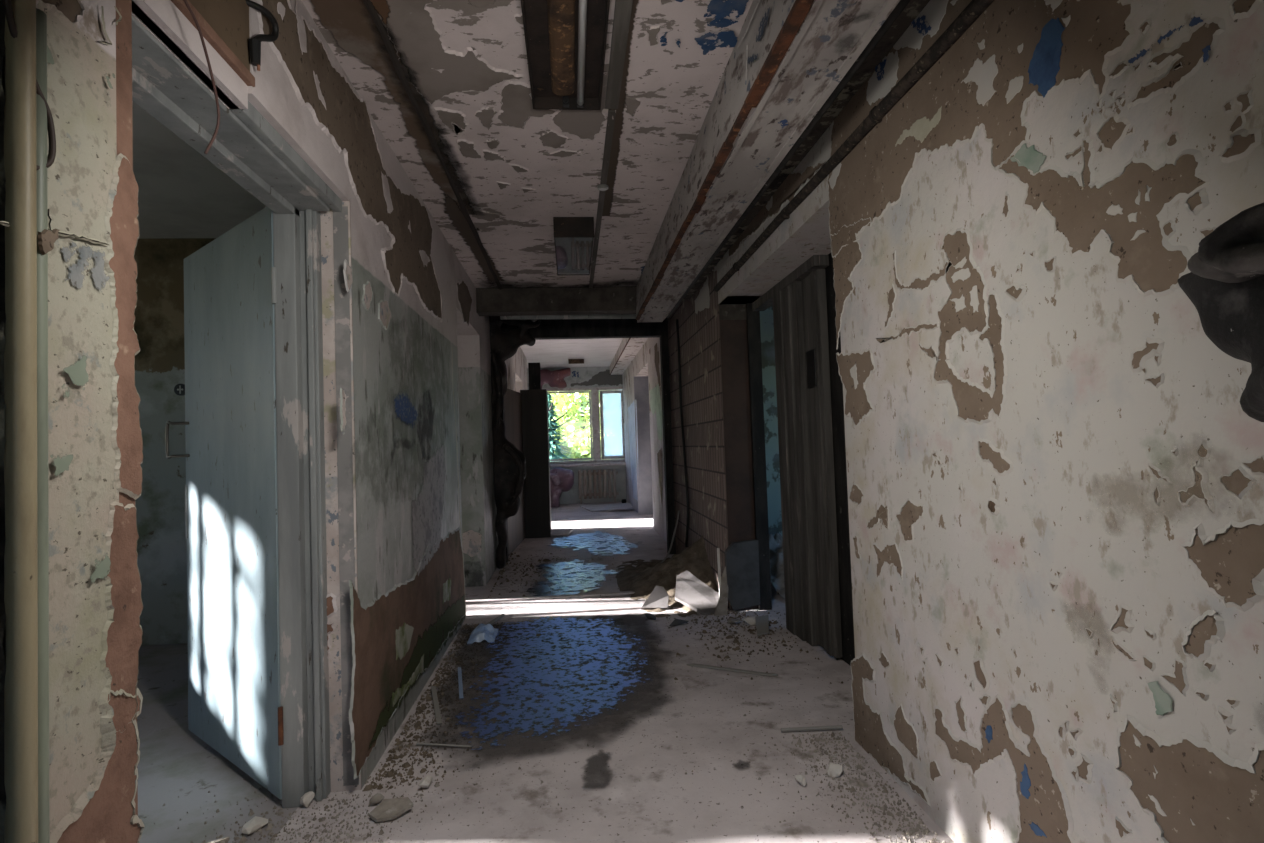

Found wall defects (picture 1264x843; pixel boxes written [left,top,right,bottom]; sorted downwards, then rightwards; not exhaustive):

peeling [36,0,85,31]
crack [48,209,109,245]
peeling [256,0,442,331]
peeling [456,280,472,326]
peeling [376,0,607,193]
peeling [646,26,661,46]
peeling [695,0,1262,516]
spalling [50,153,145,843]
peeling [853,498,926,583]
peeling [1110,440,1264,735]
peeling [851,647,1094,843]
peeling [1109,693,1264,843]